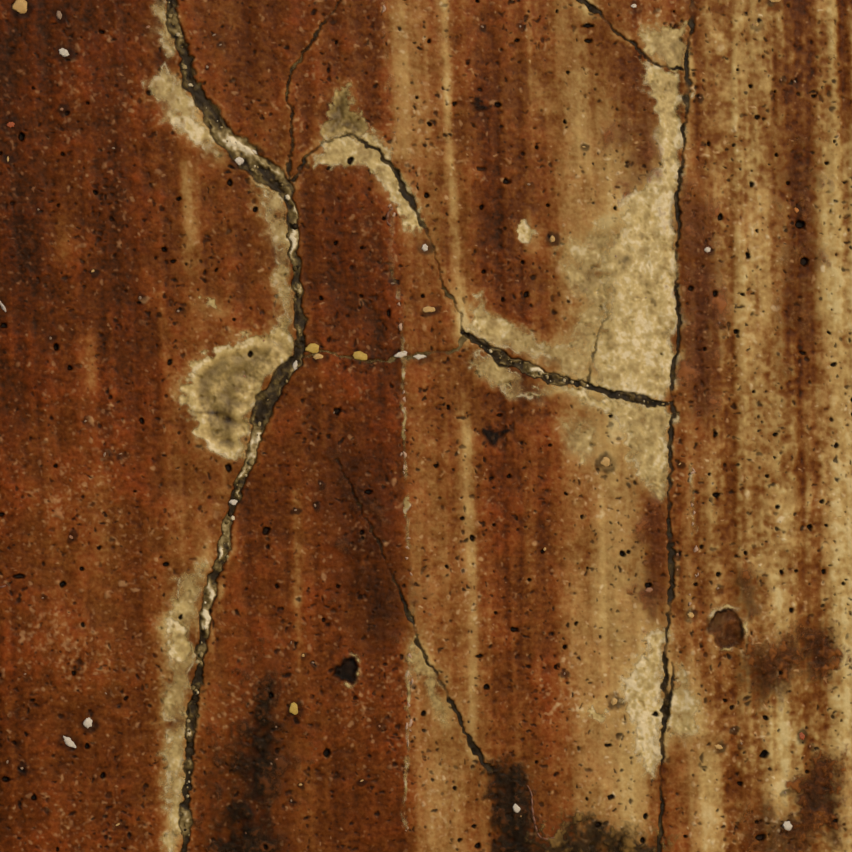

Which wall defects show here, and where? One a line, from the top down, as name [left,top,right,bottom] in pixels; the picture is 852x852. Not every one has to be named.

crack [576,0,695,259]
corrosion [675,272,730,393]
crack [166,0,428,852]
crack [369,279,682,772]
corrosion [739,624,849,702]
water stain [490,786,678,852]
crack [657,786,665,852]
corrosion [740,750,846,852]